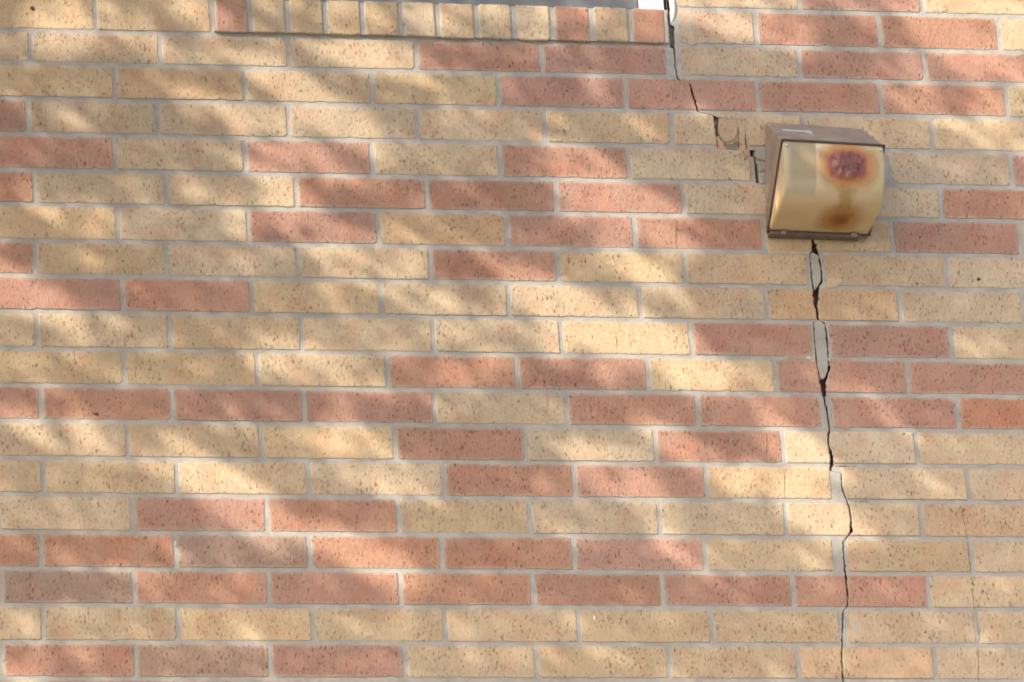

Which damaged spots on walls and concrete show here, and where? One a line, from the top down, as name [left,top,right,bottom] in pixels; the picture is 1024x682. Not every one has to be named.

crack [664,0,766,184]
crack [809,240,869,682]